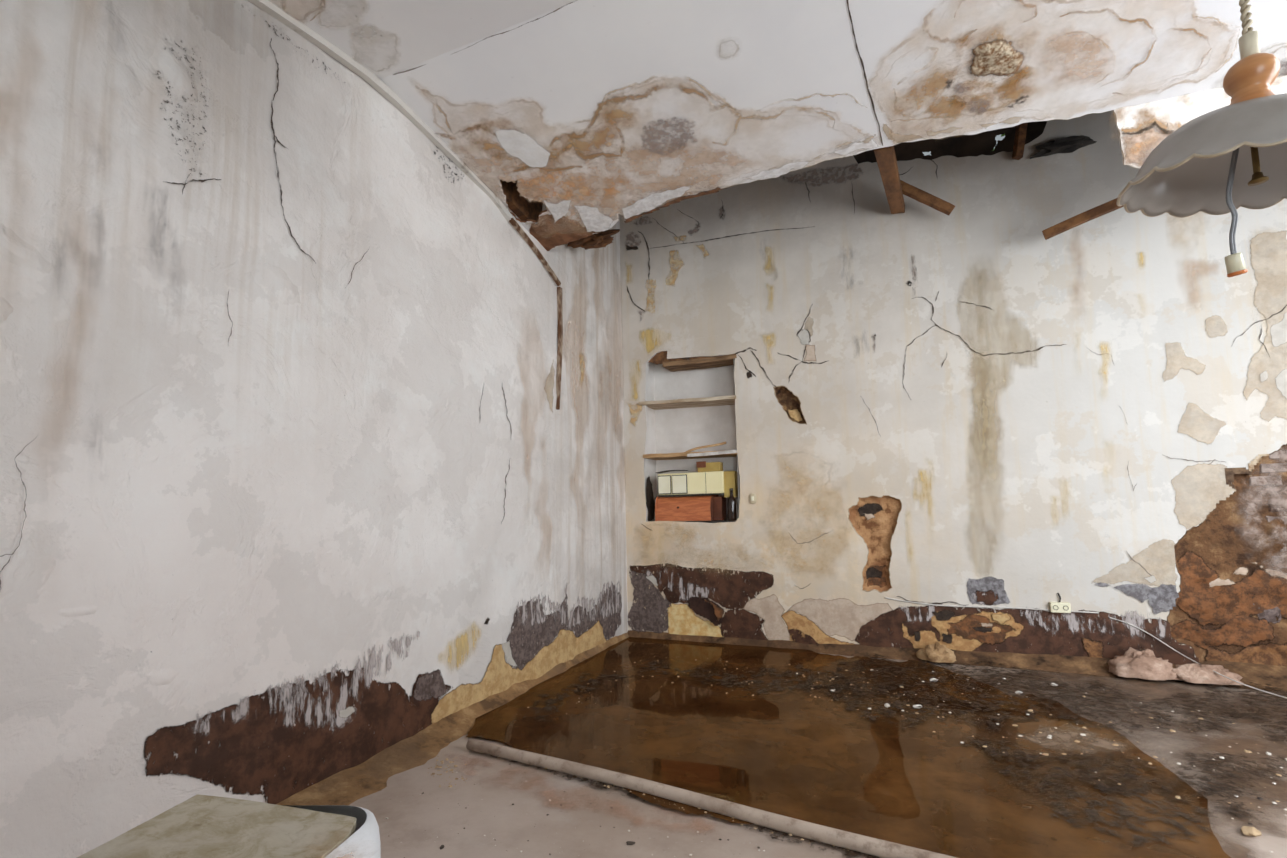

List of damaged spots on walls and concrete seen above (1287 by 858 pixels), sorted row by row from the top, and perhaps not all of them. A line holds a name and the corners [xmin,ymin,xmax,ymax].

water stain [680,79,710,98]
water stain [897,67,1029,121]
water stain [1103,10,1154,74]
crack [270,38,316,263]
water stain [467,86,739,226]
flaking render [649,351,716,365]
flaking render [773,385,807,425]
crack [902,292,1114,398]
peeling [1177,403,1226,444]
peeling [1243,231,1287,421]
crack [0,438,36,590]
peeling [144,444,1287,805]